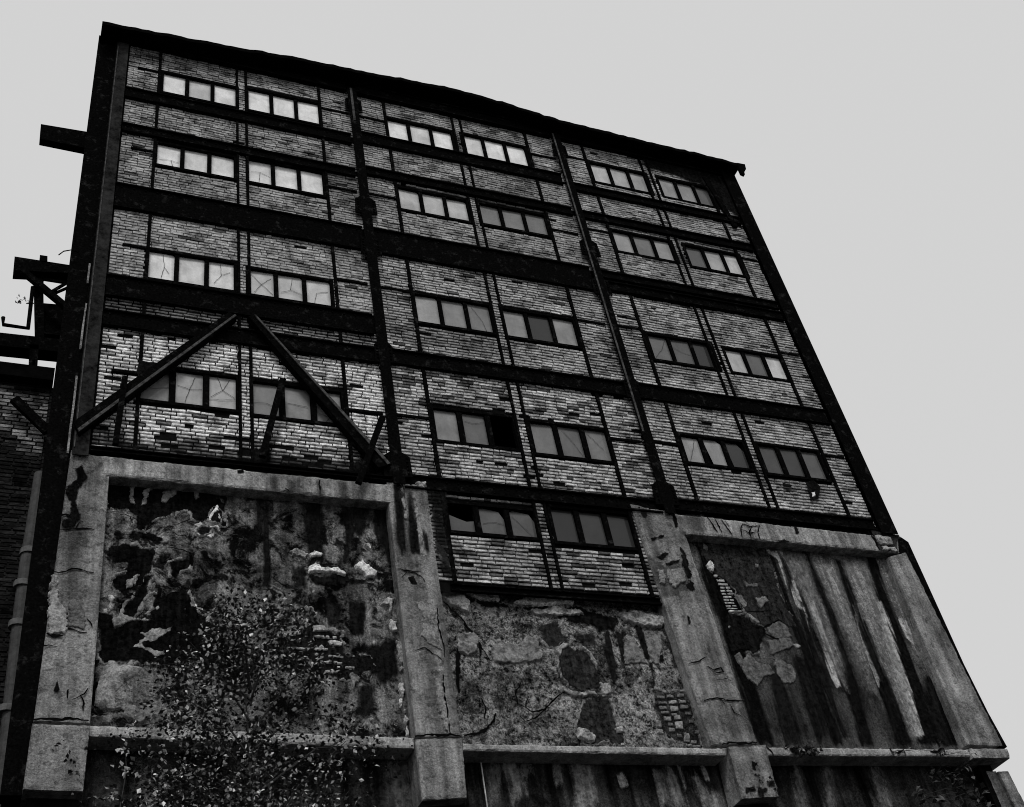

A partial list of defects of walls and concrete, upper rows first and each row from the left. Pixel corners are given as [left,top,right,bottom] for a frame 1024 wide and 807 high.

spalling [60,465,88,528]
peeling [46,485,377,690]
crack [415,601,565,737]
spalling [380,481,678,746]
spalling [657,547,695,590]
flaking render [650,687,702,748]
peeling [697,543,801,688]
damp [696,542,873,746]
damp [836,557,957,746]